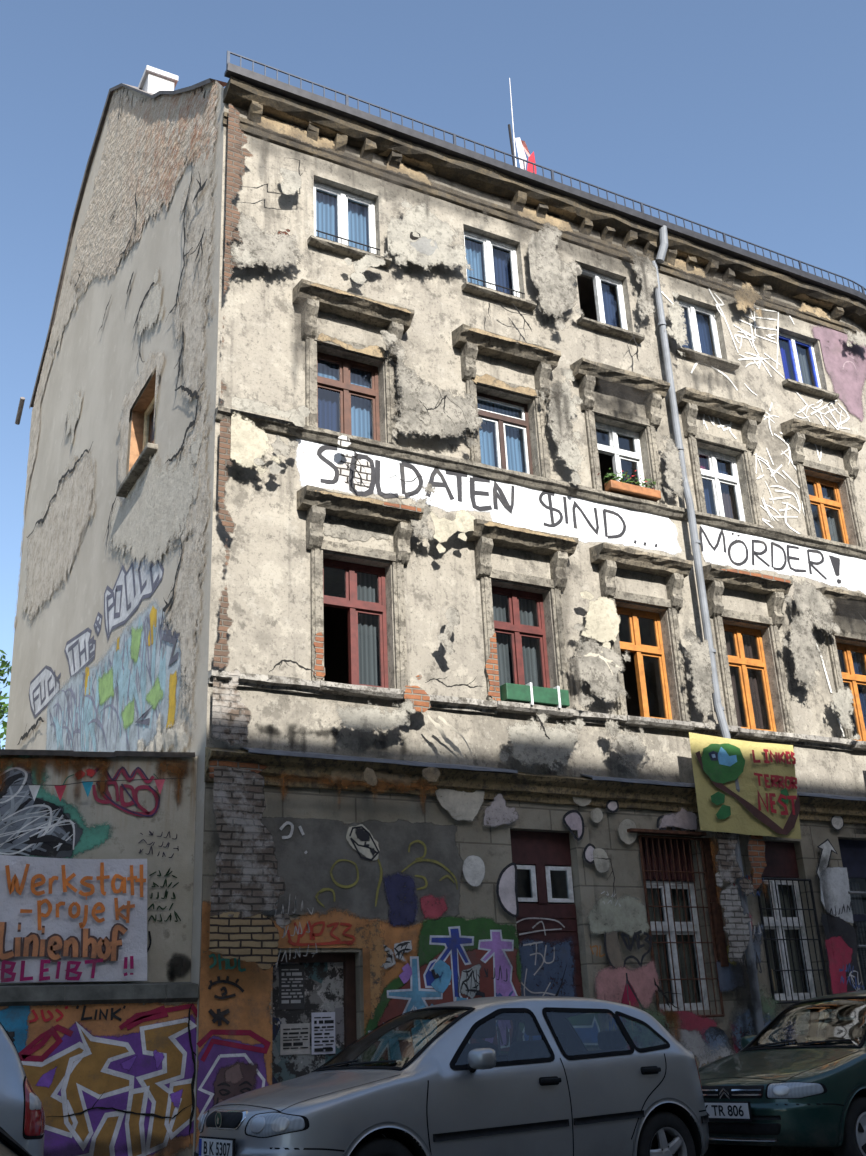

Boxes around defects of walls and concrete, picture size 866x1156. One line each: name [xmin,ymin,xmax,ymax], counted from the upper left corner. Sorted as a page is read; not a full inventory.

spalling [257,103,344,152]
crack [99,161,207,464]
crack [27,413,93,538]
spalling [13,82,310,752]
flaking render [314,435,576,553]
flaking render [314,632,325,678]
flaking render [498,591,631,773]
flaking render [605,718,650,770]
flaking render [209,759,291,970]
flaking render [715,832,767,963]